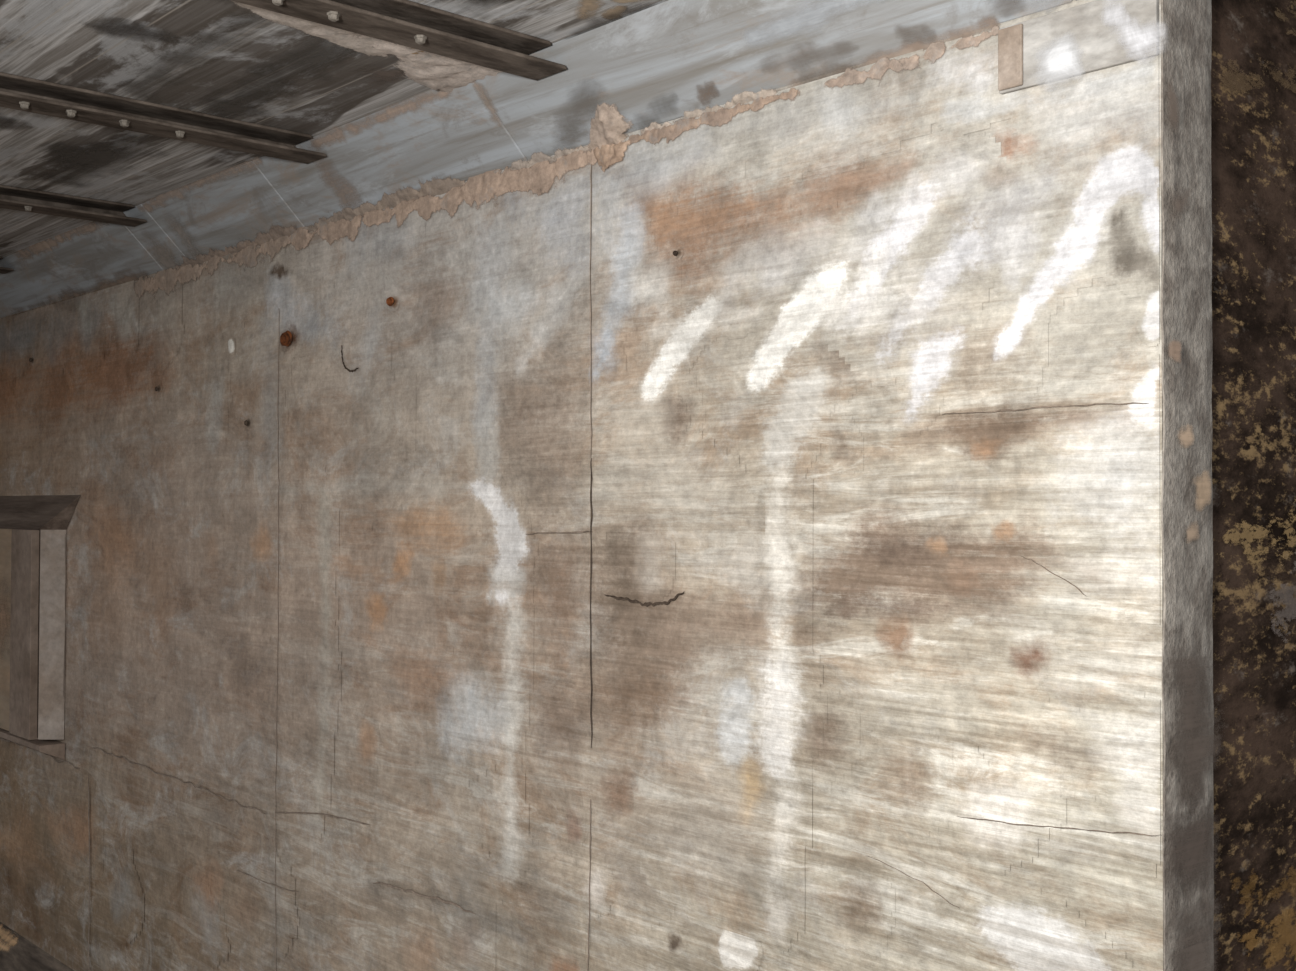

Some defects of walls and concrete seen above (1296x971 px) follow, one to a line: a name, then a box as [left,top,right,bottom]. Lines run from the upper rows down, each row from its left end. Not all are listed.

damp [90,20,228,97]
spalling [233,1,502,93]
spalling [825,25,999,88]
spalling [134,88,800,299]
damp [0,269,184,387]
crack [528,149,684,747]
damp [195,5,1218,971]
damp [183,876,230,971]
crack [585,799,593,971]